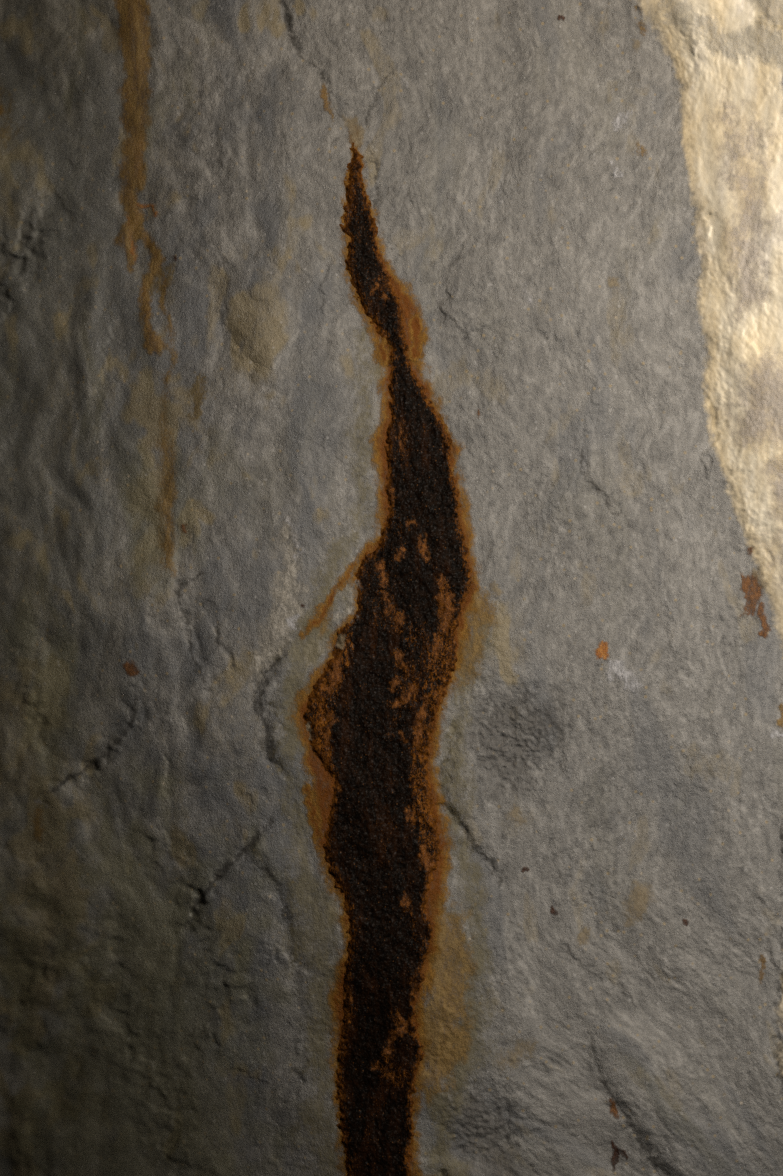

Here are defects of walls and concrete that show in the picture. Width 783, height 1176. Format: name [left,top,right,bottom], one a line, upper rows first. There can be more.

rust [114,0,177,381]
rust [291,118,497,1176]
rust [596,641,609,659]
rust [741,568,771,638]